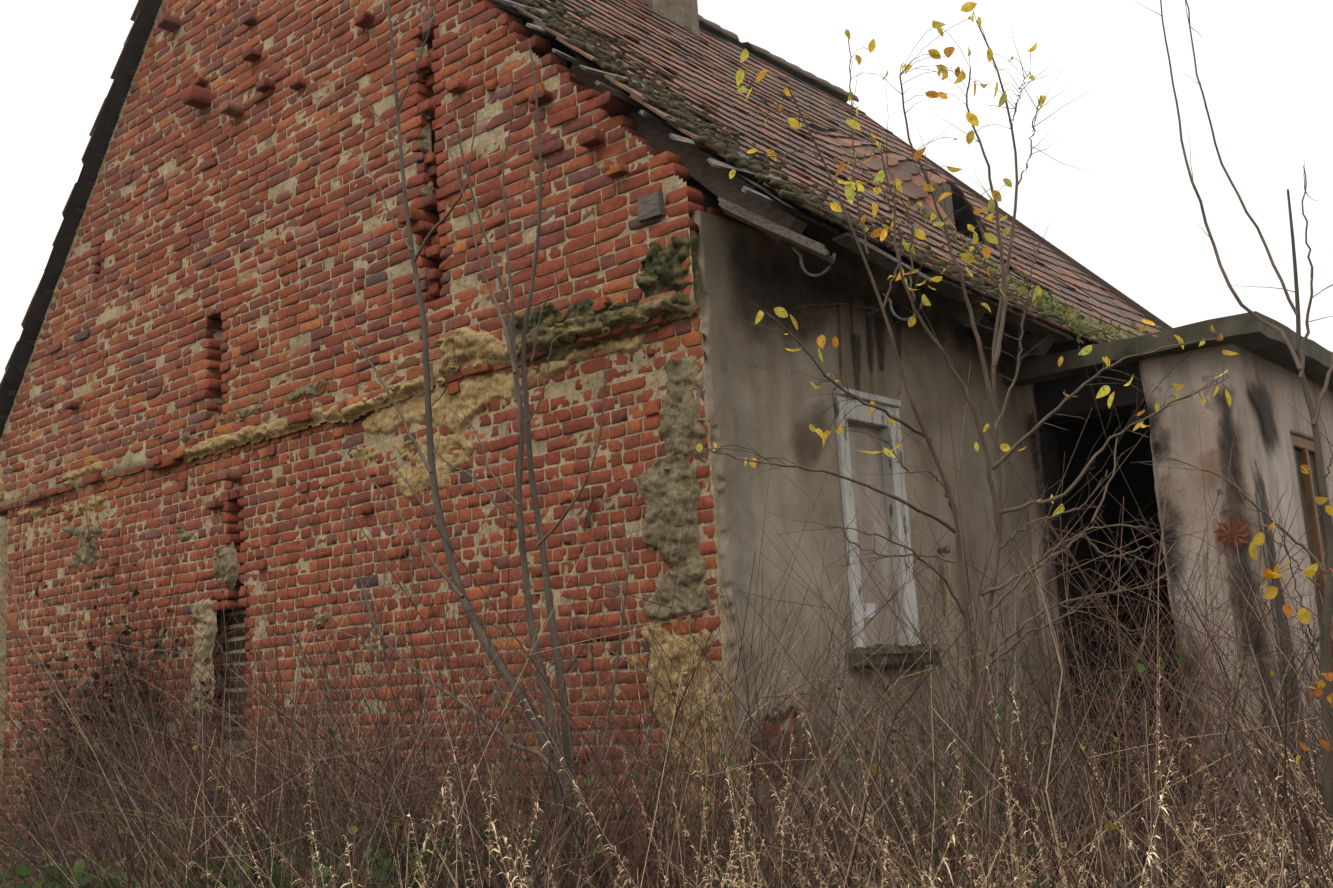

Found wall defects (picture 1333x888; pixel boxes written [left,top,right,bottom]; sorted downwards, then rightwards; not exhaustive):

spalling [361,332,645,498]
spalling [17,490,110,519]
damp [1216,382,1321,835]